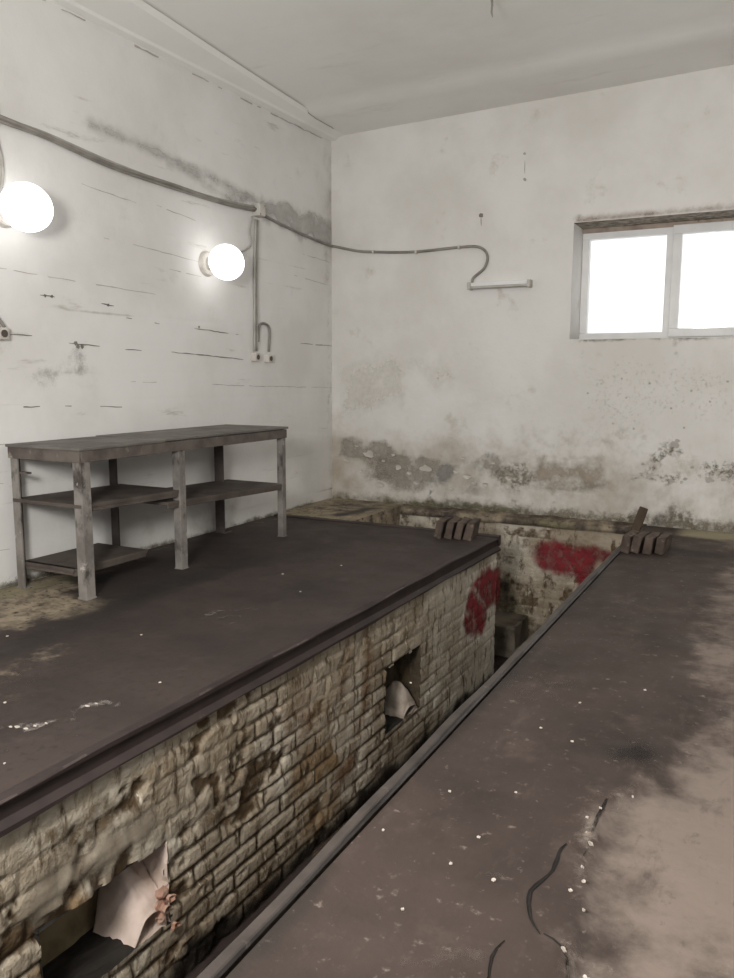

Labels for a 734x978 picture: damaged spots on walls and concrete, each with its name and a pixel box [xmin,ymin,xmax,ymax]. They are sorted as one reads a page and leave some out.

peeling [354,445,432,485]
water stain [341,439,526,512]
water stain [484,455,599,488]
peeling [630,439,734,484]
spalling [400,514,442,529]
water stain [661,507,734,532]
spalling [0,522,623,978]
crack [526,798,607,978]
crack [487,941,504,978]